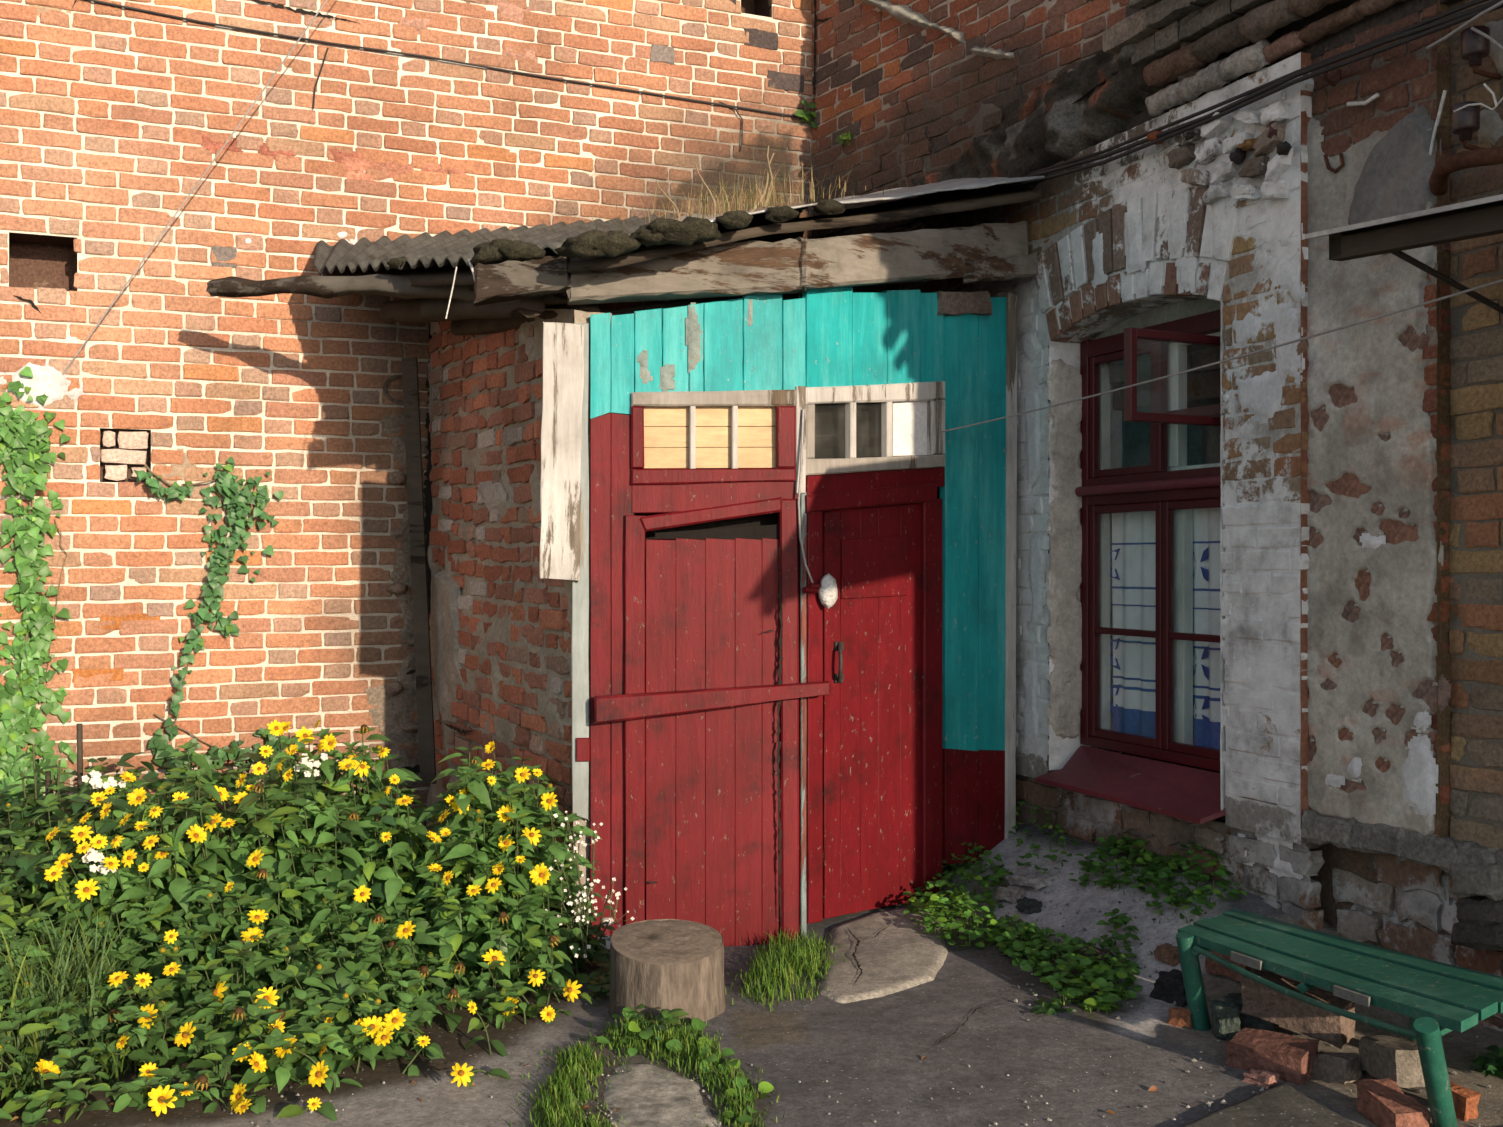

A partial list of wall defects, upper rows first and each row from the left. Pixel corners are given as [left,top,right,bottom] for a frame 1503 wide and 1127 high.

peeling [1091,231,1108,289]
peeling [1124,209,1146,274]
peeling [1168,181,1229,294]
peeling [1230,223,1305,426]
flaking render [1398,326,1430,352]
flaking render [1311,383,1358,432]
flaking render [1309,473,1419,549]
flaking render [1341,568,1371,623]
flaking render [1320,653,1342,690]
flaking render [1380,632,1404,667]
peeling [1325,674,1451,817]
crack [848,927,887,984]